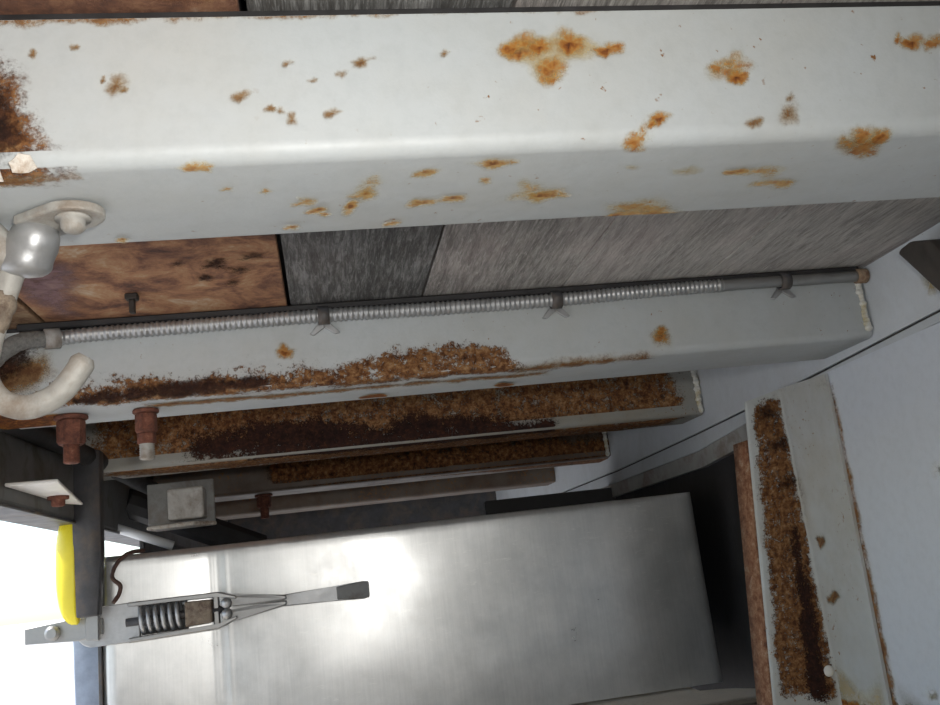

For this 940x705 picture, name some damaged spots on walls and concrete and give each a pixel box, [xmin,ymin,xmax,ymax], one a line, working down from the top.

corrosion [0,18,146,27]
corrosion [101,77,128,94]
corrosion [499,29,624,84]
corrosion [709,53,751,85]
corrosion [0,61,47,153]
corrosion [624,112,668,152]
corrosion [839,128,890,157]
peeling [0,153,38,182]
corrosion [0,167,75,187]
corrosion [0,341,684,487]
corrosion [733,398,865,705]
corrosion [833,399,898,705]